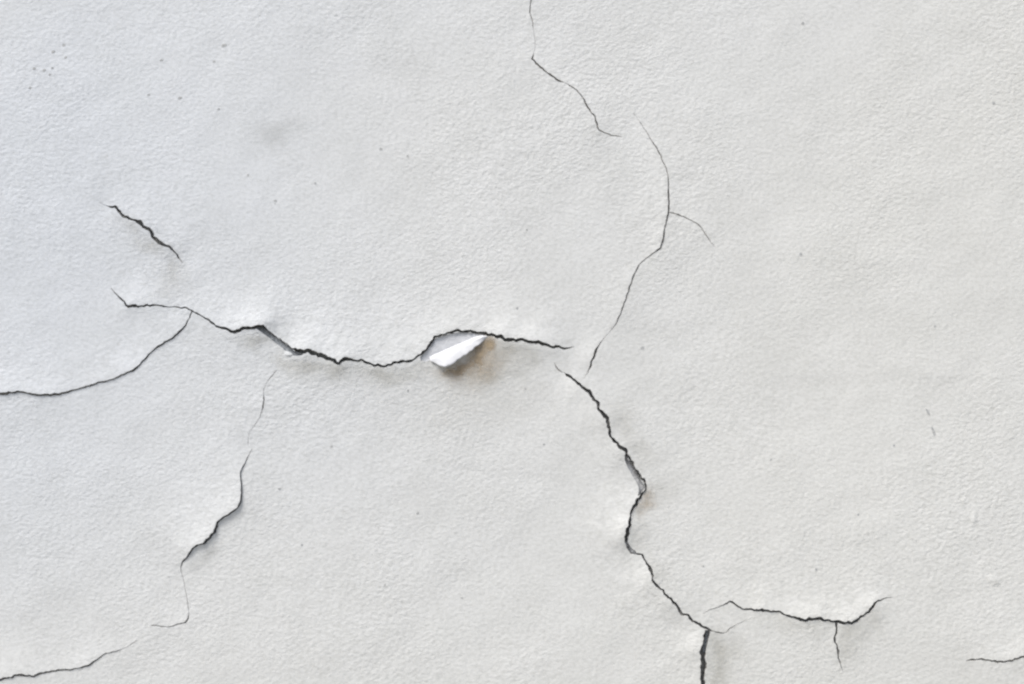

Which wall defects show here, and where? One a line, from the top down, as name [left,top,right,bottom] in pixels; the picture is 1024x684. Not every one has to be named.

crack [529,0,622,137]
crack [0,113,891,684]
peeling [420,332,488,367]